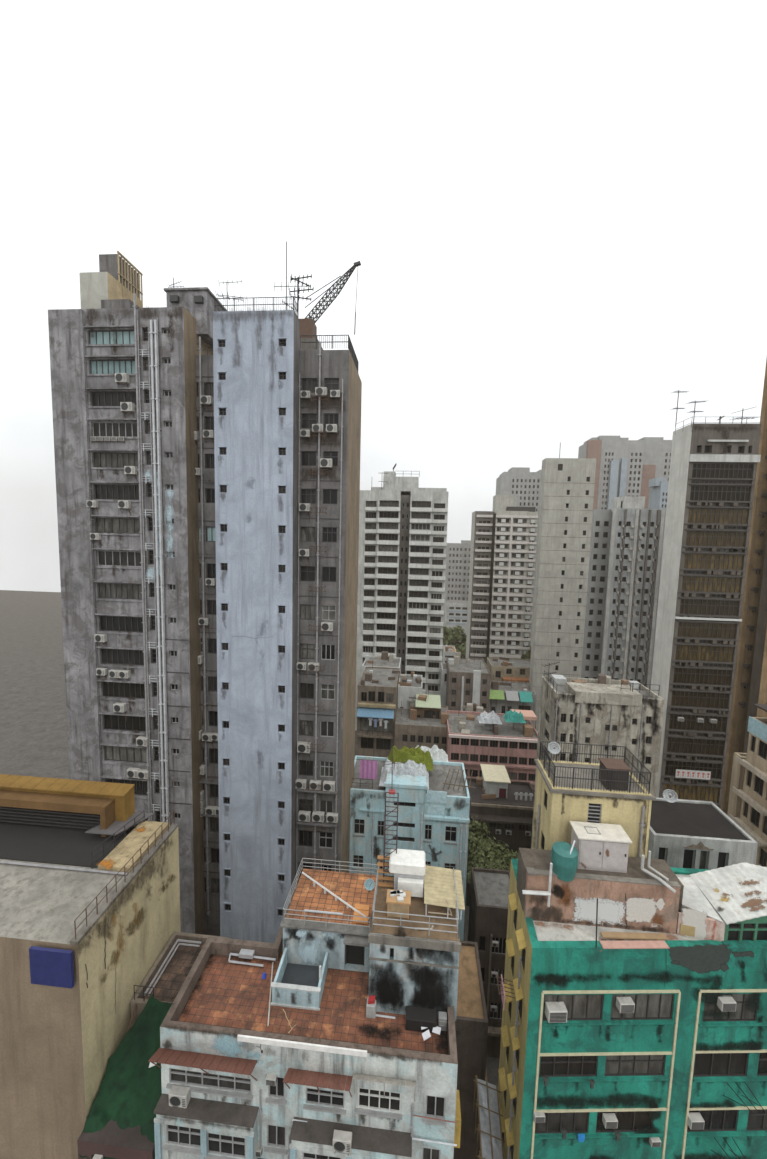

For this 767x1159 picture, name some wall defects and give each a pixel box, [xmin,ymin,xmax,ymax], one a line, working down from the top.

peeling [572,896,665,927]
water stain [368,927,454,1012]
water stain [534,974,566,986]
flaking render [668,908,754,974]
water stain [747,992,763,1050]
water stain [634,1103,661,1147]